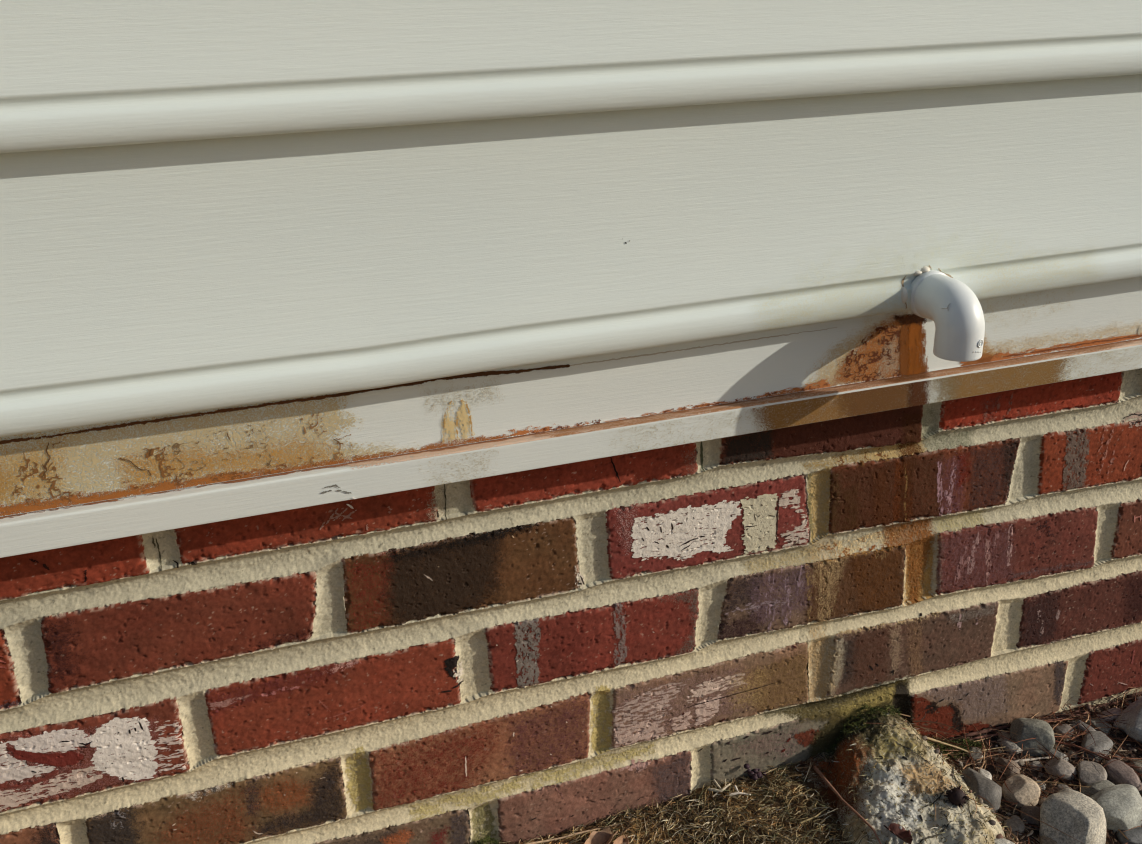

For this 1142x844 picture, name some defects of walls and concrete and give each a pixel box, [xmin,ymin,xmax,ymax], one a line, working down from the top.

leakage [0,393,426,512]
rust [0,302,1142,613]